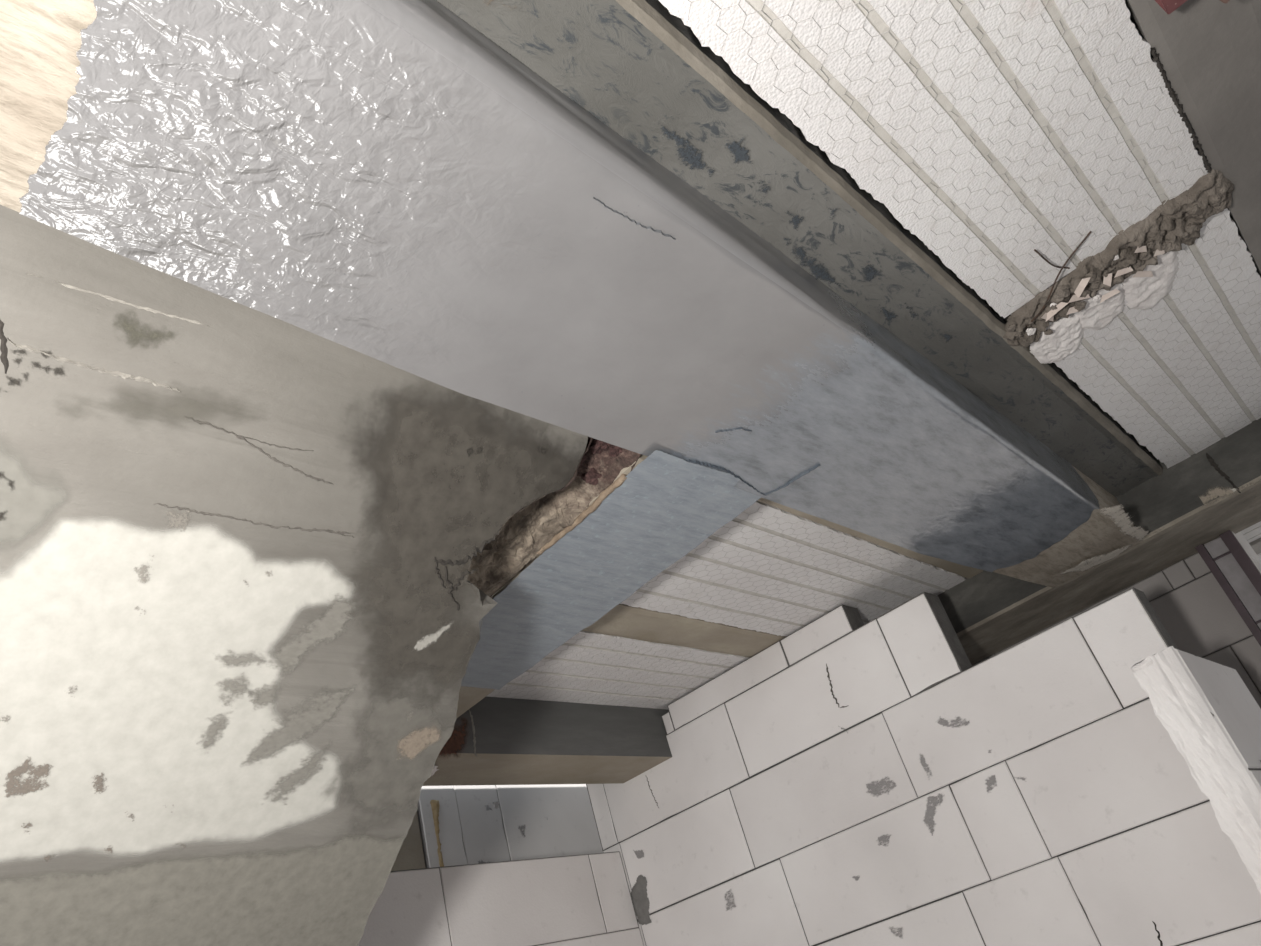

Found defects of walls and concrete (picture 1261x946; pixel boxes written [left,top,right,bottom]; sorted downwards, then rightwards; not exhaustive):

crack [1151,47,1212,173]
crack [0,320,9,374]
crack [184,416,334,485]
crack [154,503,354,538]
spalling [443,437,641,602]
water stain [203,395,582,823]
water stain [0,823,405,946]